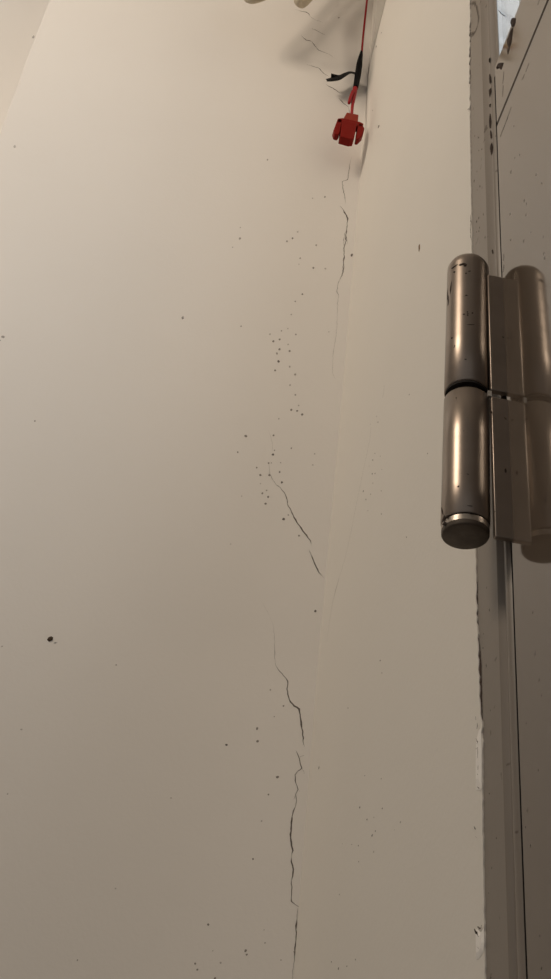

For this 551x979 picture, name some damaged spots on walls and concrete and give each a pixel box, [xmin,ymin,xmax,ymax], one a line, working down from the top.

crack [337,166,350,303]
crack [273,480,319,572]
crack [275,664,305,966]